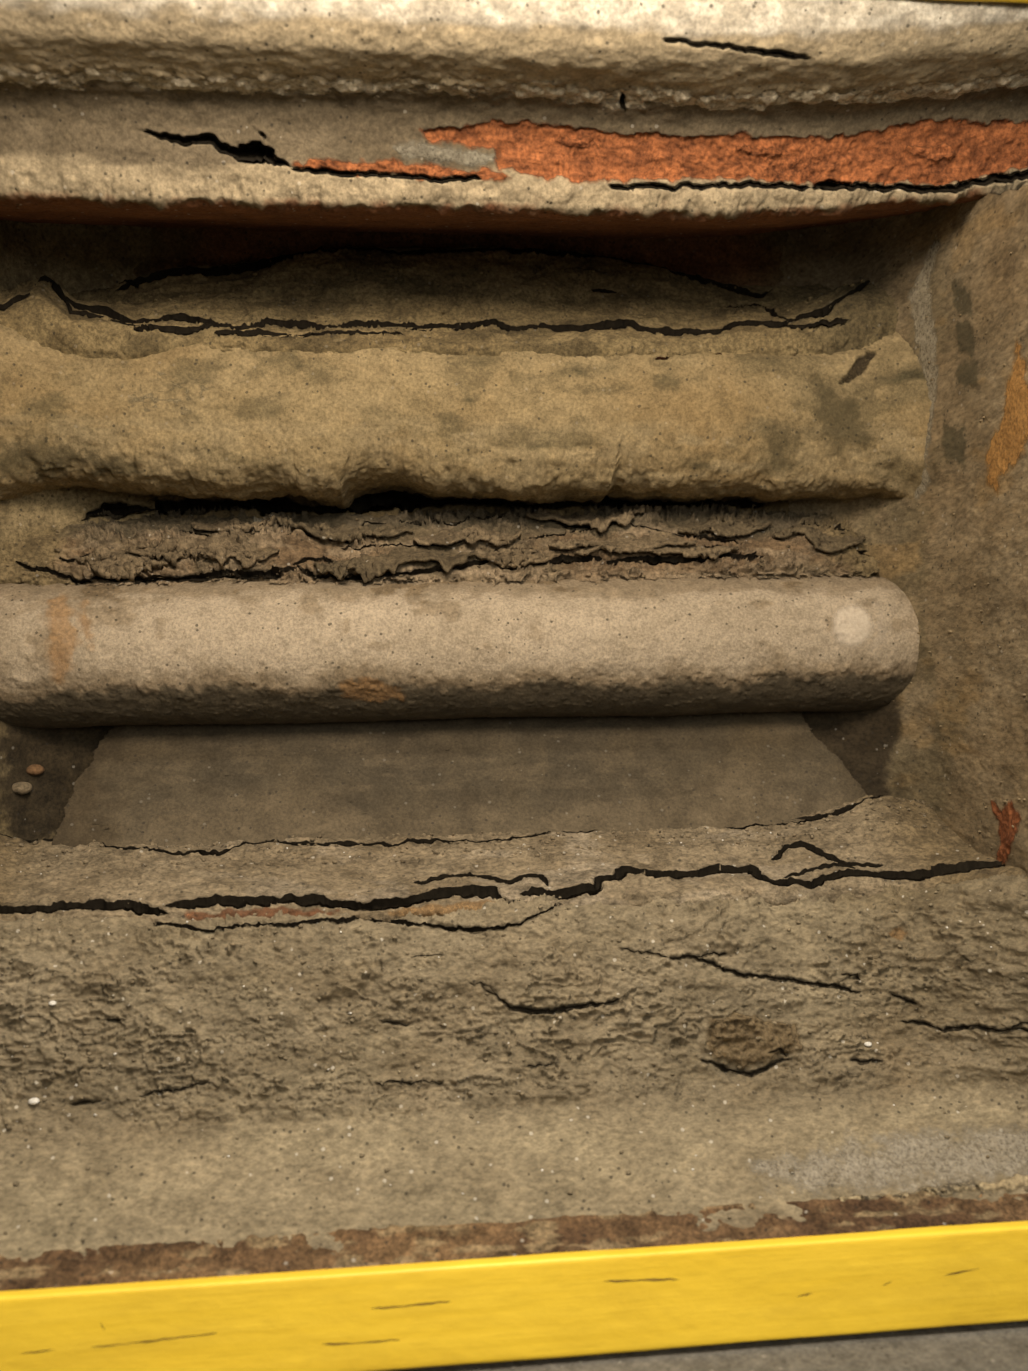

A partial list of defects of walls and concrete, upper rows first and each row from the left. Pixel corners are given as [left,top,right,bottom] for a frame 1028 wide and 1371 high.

crack [144,130,481,183]
crack [609,171,1028,194]
crack [0,246,870,360]
corrosion [986,342,1028,493]
spalling [81,502,155,521]
corrosion [991,801,1021,864]
crack [0,795,1005,958]
crack [620,948,1028,1032]
crack [377,1078,444,1086]